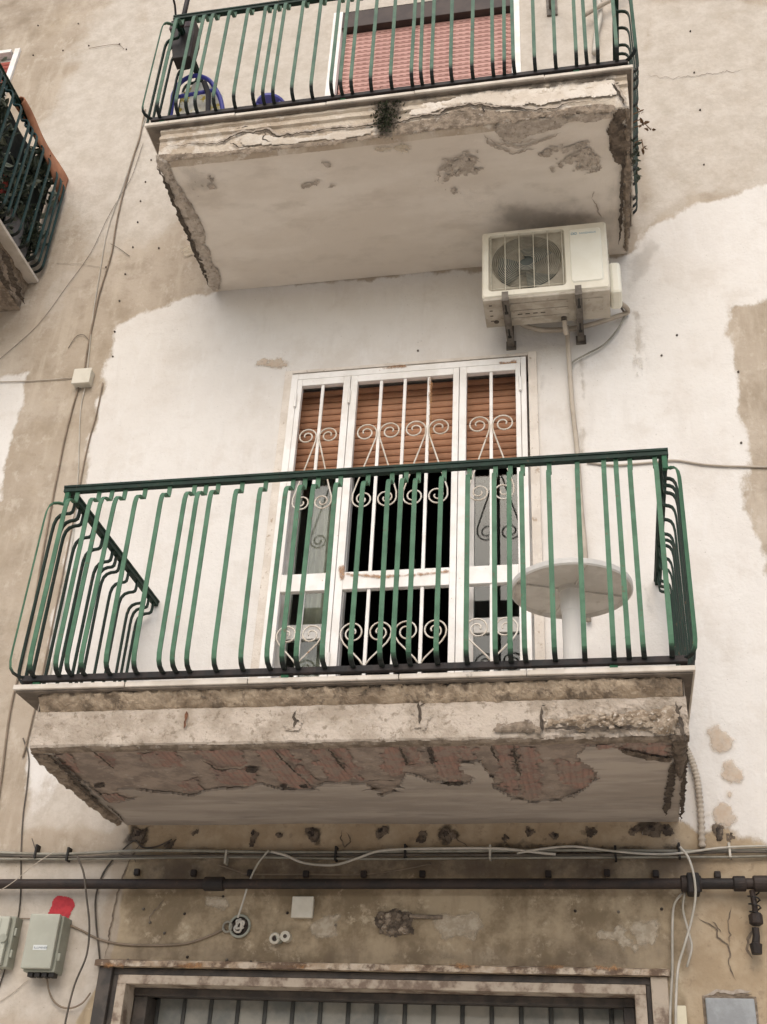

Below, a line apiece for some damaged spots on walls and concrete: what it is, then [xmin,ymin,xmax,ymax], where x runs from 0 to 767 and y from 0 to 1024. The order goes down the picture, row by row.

crack [158,82,627,148]
peeling [155,79,633,292]
peeling [256,358,287,368]
flaking render [31,701,688,845]
peeling [707,725,743,842]
water stain [495,838,579,854]
flaking render [374,908,414,937]
crack [701,910,752,996]